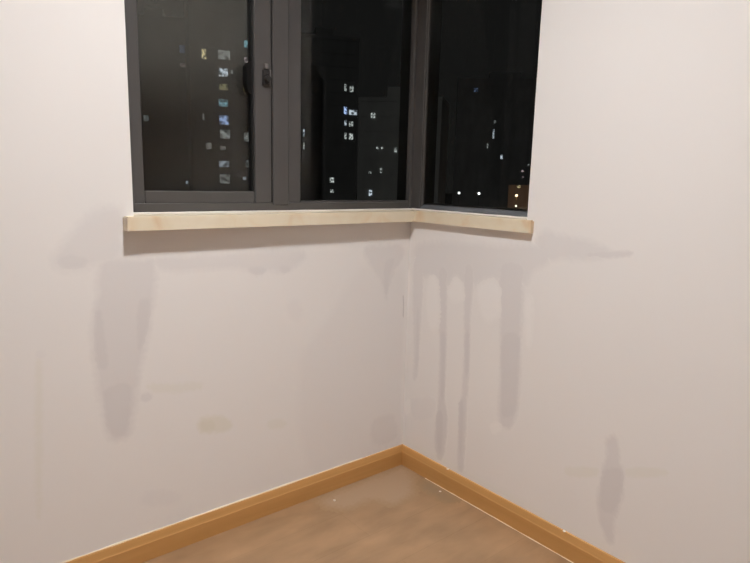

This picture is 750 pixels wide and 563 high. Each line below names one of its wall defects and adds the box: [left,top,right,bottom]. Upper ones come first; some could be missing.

water stain [46,200,308,445]
water stain [295,226,635,475]
water stain [563,432,670,546]